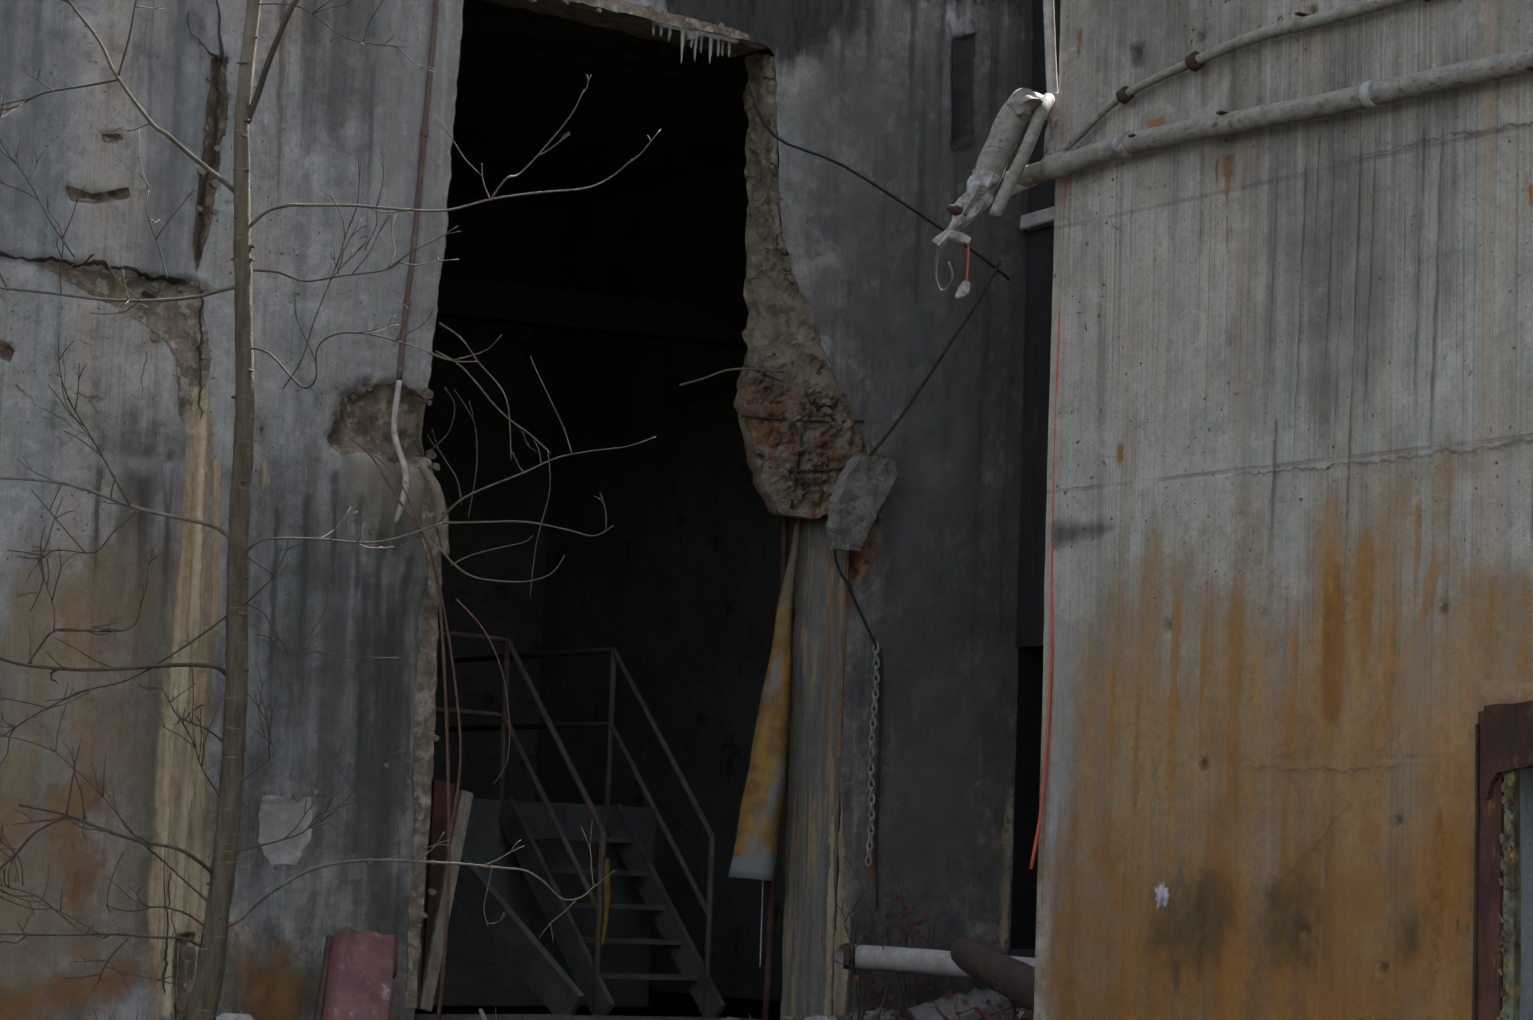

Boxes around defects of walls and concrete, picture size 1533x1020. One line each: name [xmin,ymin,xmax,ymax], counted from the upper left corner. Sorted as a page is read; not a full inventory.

spalling [0,340,15,360]
spalling [43,57,232,427]
spalling [560,0,870,455]
crack [1244,439,1533,475]
spalling [327,383,443,1009]
rust [1048,505,1533,1020]